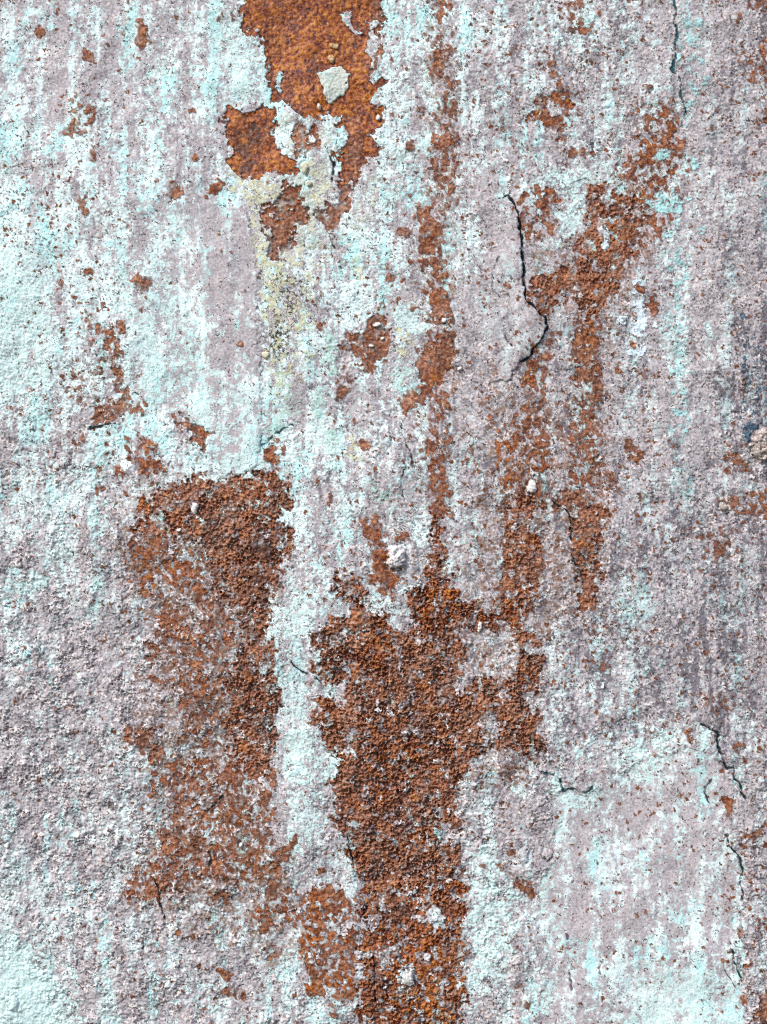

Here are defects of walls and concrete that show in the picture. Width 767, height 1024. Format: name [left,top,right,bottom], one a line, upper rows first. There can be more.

crack [670,0,687,127]
crack [492,195,548,362]
rust [63,302,148,425]
rust [95,0,692,1024]
crack [701,724,747,803]
rust [721,796,734,820]